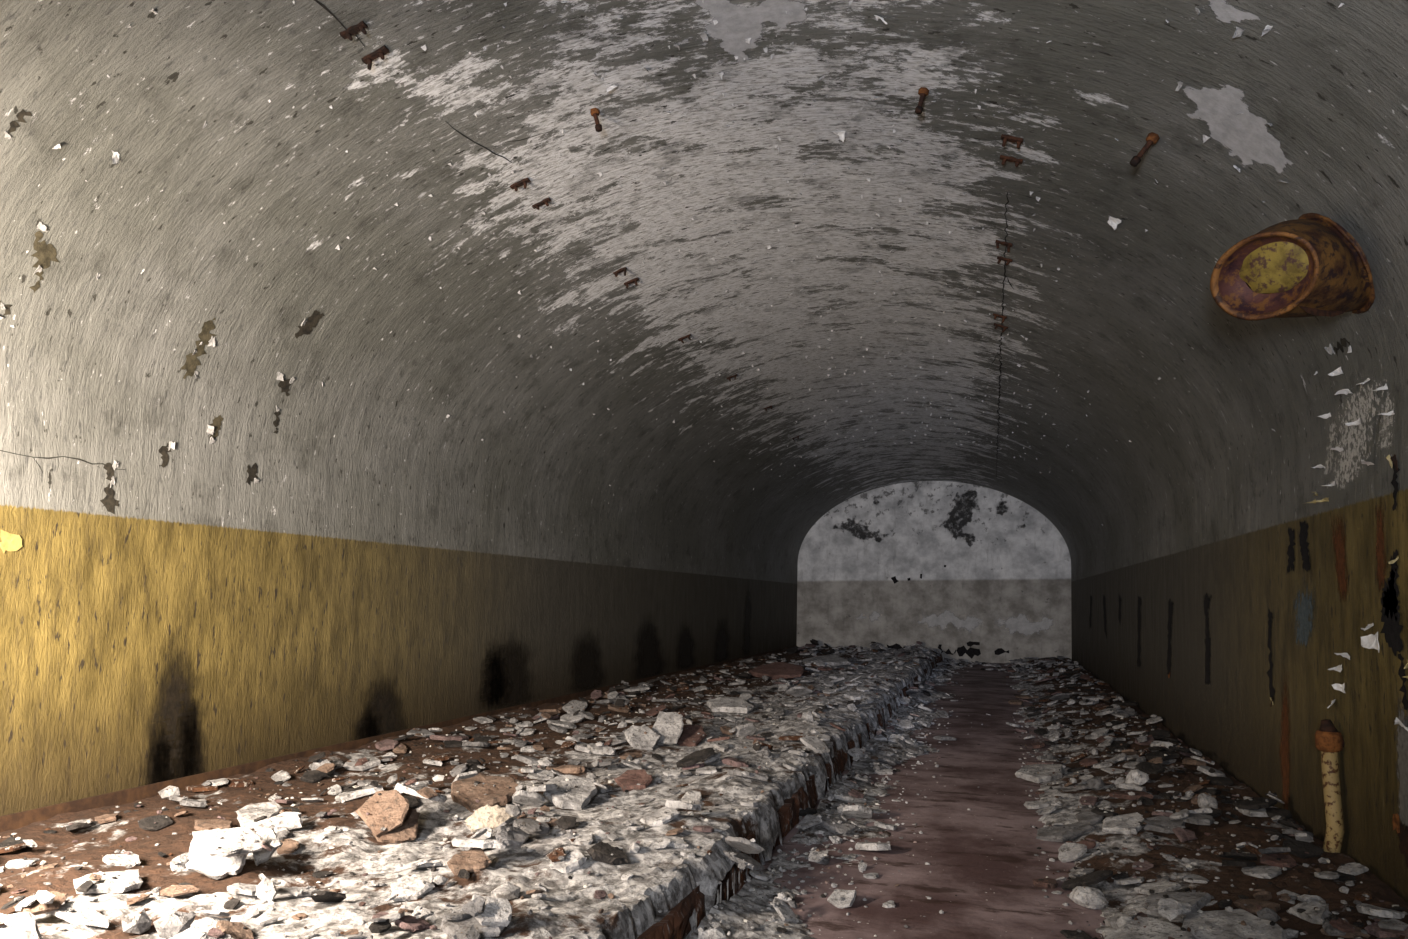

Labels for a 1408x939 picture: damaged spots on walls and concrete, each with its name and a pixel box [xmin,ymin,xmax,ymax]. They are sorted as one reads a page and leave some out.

crack [314,0,365,47]
peeling [1162,80,1294,183]
peeling [29,222,60,293]
peeling [751,278,1019,477]
peeling [1314,338,1388,395]
peeling [1307,464,1335,504]
peeling [1327,623,1379,708]
water stain [148,654,204,785]
water stain [356,683,404,740]